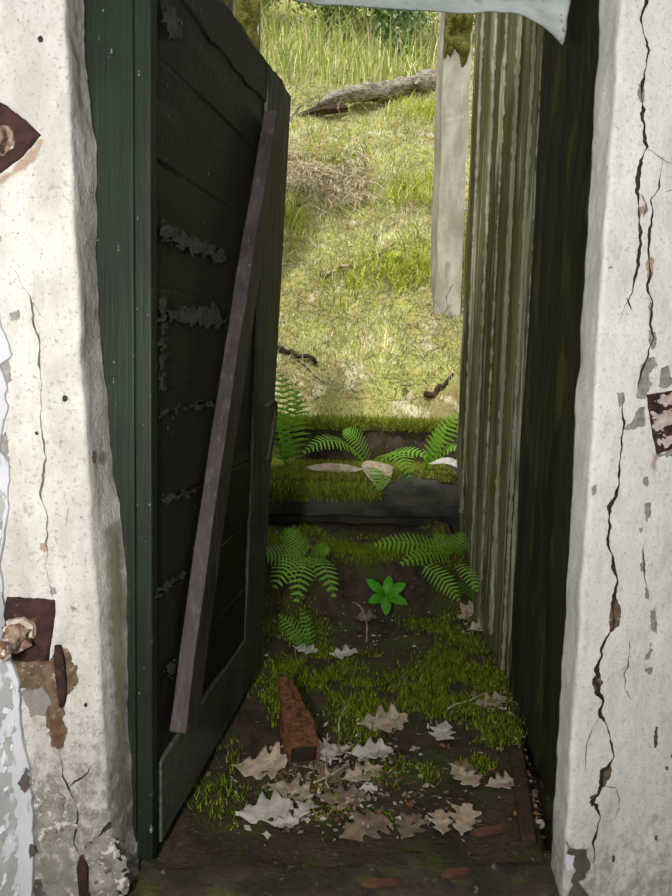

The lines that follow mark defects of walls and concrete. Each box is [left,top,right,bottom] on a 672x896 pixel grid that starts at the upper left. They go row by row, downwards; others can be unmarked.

rust [0,141,42,183]
spalling [0,359,13,385]
water stain [459,12,543,671]
spalling [1,432,11,468]
crack [14,270,69,595]
crack [585,0,669,884]
spalling [0,644,79,896]
crack [59,751,111,854]
peeling [64,832,130,896]
peeling [566,854,575,871]